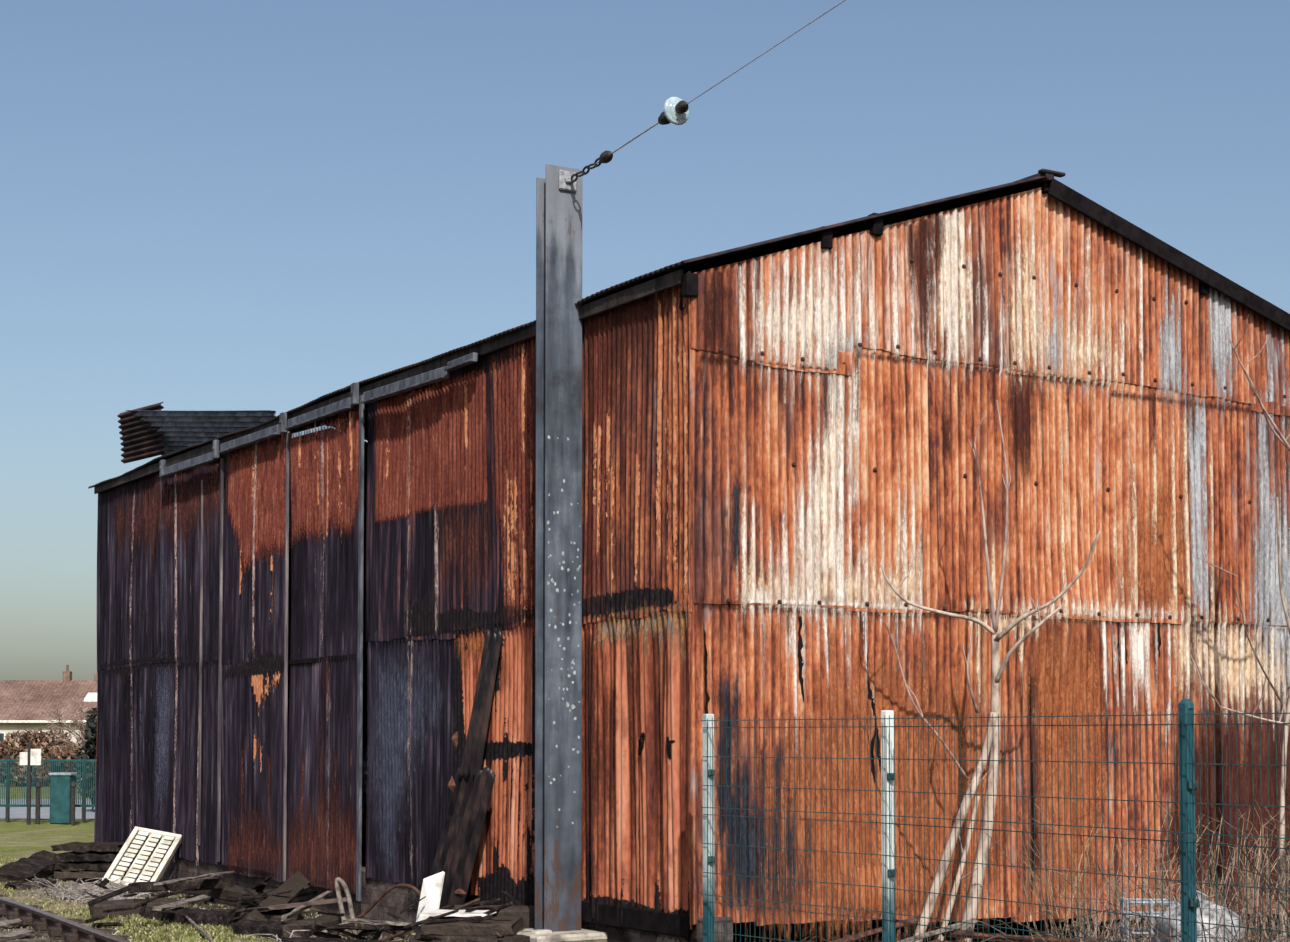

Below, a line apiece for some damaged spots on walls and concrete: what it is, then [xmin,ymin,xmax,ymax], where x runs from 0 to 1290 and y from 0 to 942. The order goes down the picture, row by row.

rust [457,632,484,680]
rust [581,625,666,902]
rust [582,286,679,612]
rust [697,217,1290,938]
damp [1102,613,1171,712]